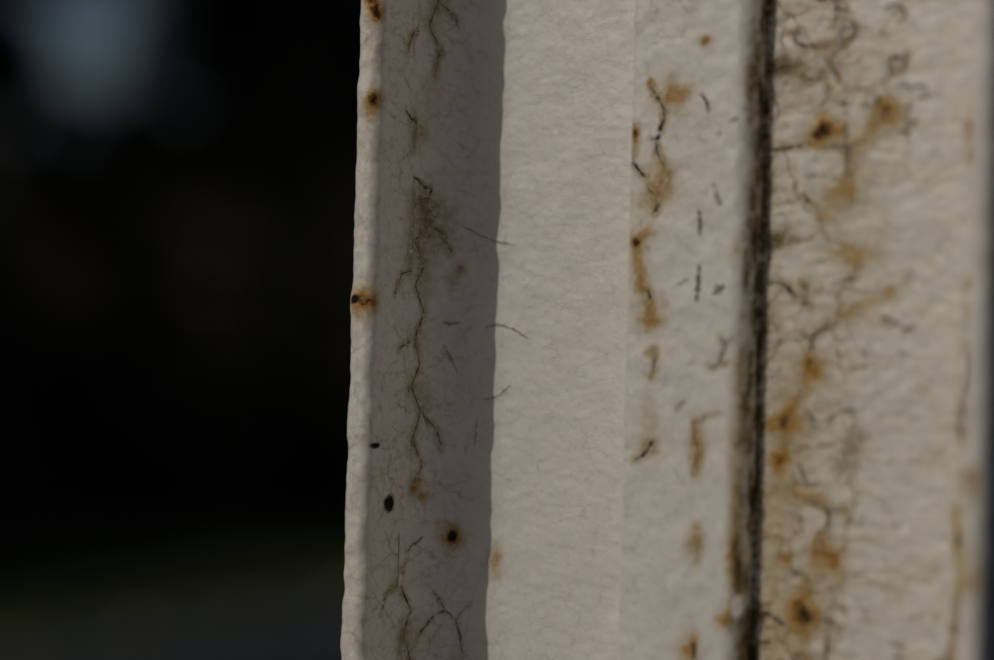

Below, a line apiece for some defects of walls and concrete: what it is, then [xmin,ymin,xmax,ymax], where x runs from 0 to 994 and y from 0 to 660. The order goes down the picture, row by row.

corrosion [364,0,384,21]
corrosion [364,90,381,114]
crack [632,79,671,216]
corrosion [804,112,843,148]
crack [748,0,930,191]
crack [394,175,516,480]
corrosion [630,228,662,332]
crack [639,264,726,317]
crack [760,276,860,358]
corrosion [764,399,801,478]
crack [753,380,865,660]
corrosion [785,586,821,656]